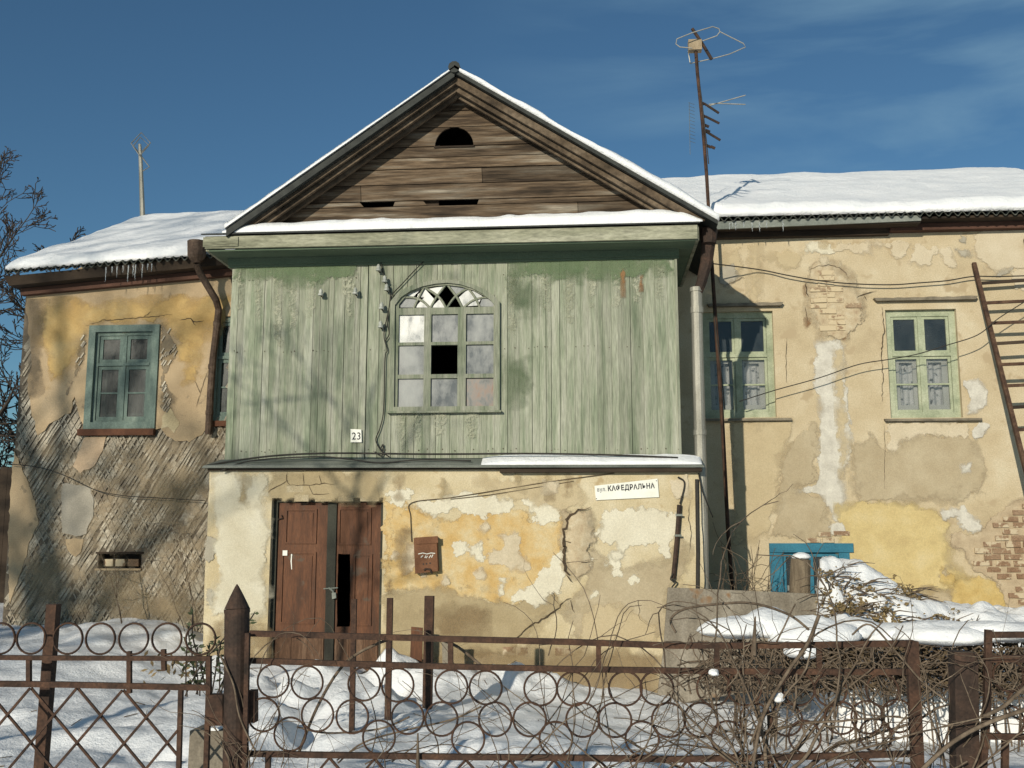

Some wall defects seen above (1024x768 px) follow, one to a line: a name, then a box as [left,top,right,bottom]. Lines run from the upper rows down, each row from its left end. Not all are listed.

peeling [42,269,261,413]
spalling [775,230,1024,340]
crack [270,475,328,495]
peeling [669,473,689,499]
damp [798,339,853,521]
peeling [852,378,1024,608]
peeling [287,480,687,655]
crack [518,507,591,637]